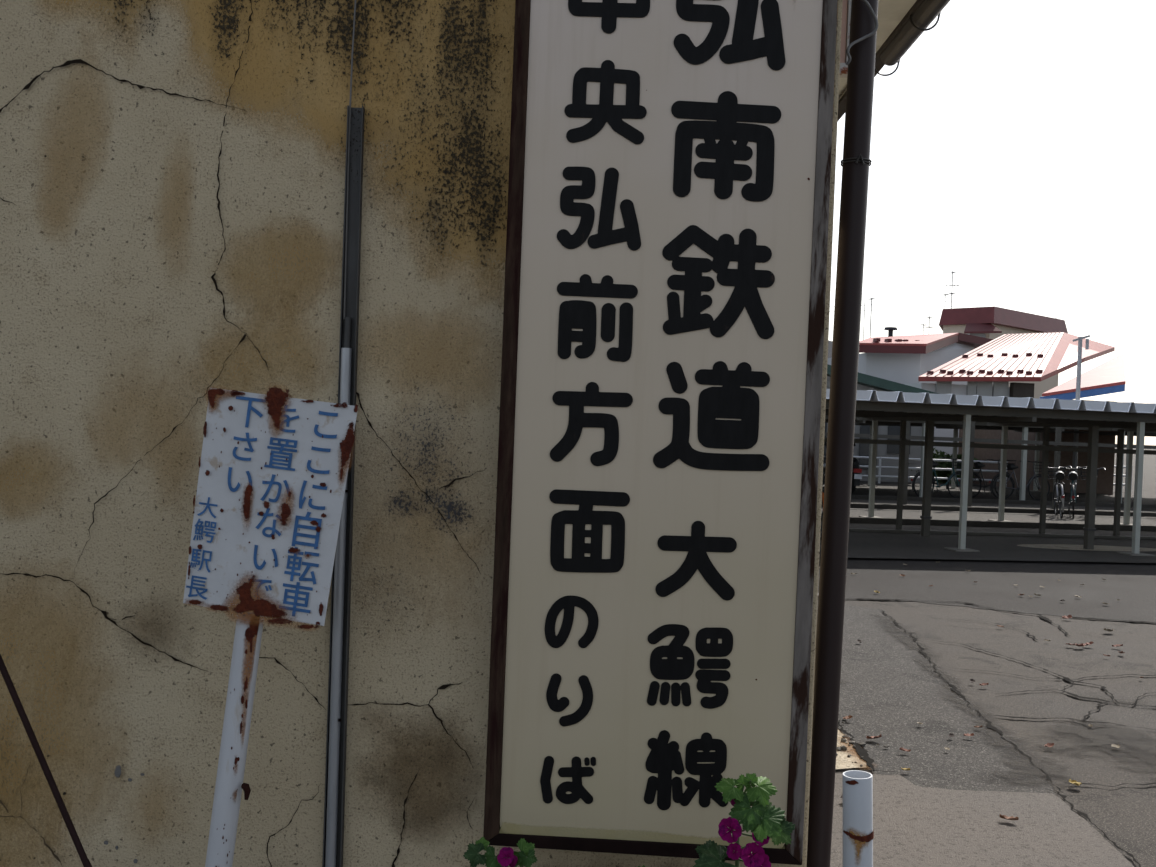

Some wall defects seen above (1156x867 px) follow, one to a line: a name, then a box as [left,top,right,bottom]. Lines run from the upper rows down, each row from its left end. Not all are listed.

water stain [47,0,159,47]
water stain [168,0,515,287]
crack [0,0,292,672]
crack [352,382,484,574]
water stain [0,607,83,808]
crack [259,657,473,767]
crack [0,761,62,865]
crack [266,783,321,867]
crack [392,770,419,867]